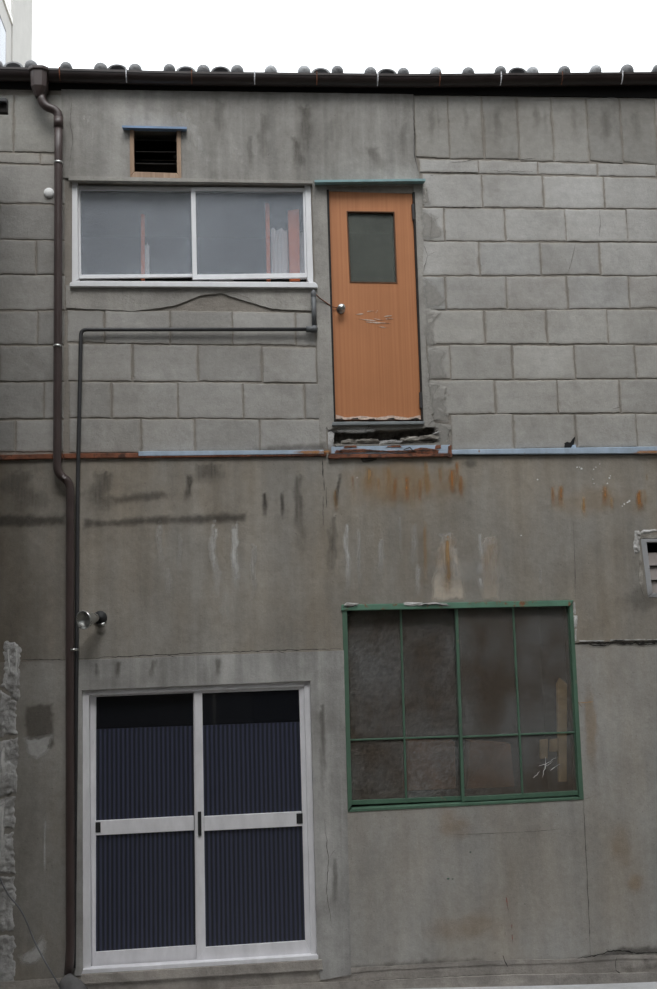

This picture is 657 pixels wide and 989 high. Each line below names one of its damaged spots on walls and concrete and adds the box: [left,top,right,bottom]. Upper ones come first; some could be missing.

spalling [328,418,452,462]
damp [433,533,463,600]
crack [580,639,657,647]